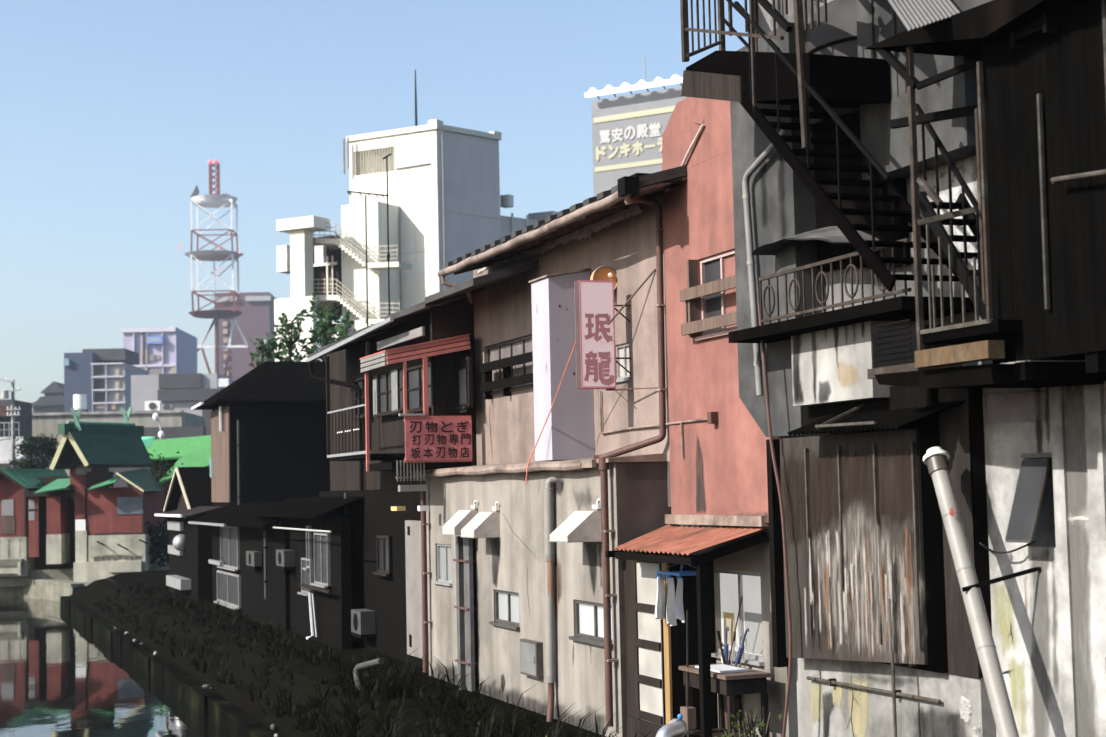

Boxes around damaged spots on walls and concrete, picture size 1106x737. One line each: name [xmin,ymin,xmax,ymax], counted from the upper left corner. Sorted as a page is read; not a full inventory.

leakage [1035,387,1049,453]
leakage [1011,549,1058,737]
leakage [1066,385,1093,737]